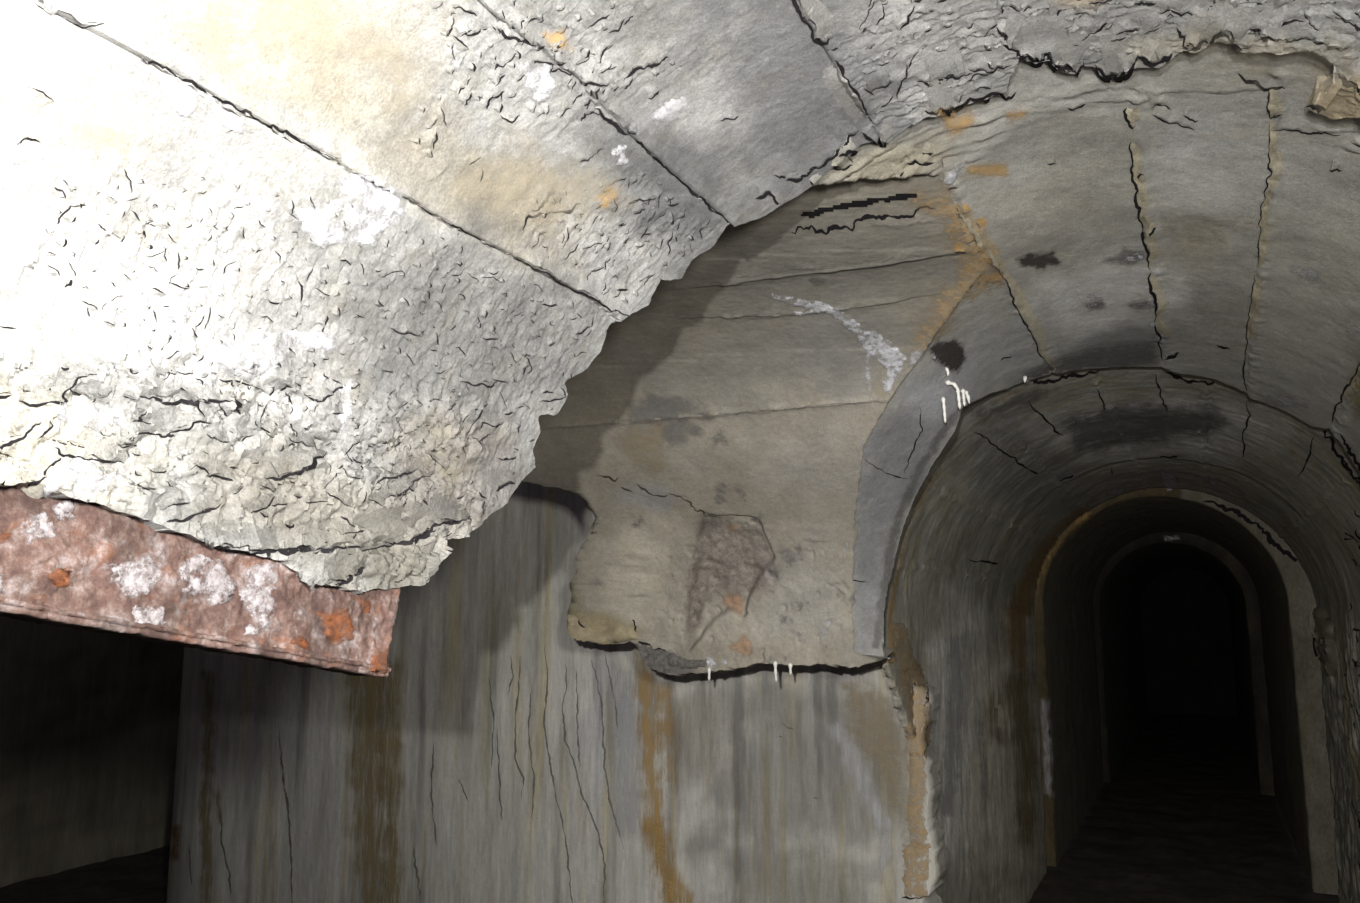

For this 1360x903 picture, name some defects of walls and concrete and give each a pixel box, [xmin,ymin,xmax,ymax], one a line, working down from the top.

crack [35,0,108,29]
spalling [409,0,675,158]
spalling [846,0,1360,113]
crack [141,57,633,316]
water stain [1019,252,1060,269]
crack [751,0,1360,458]
spalling [0,169,710,557]
water stain [772,293,966,396]
rust [49,568,73,588]
rust [317,600,370,643]
water stain [349,665,421,903]
rust [638,669,692,903]